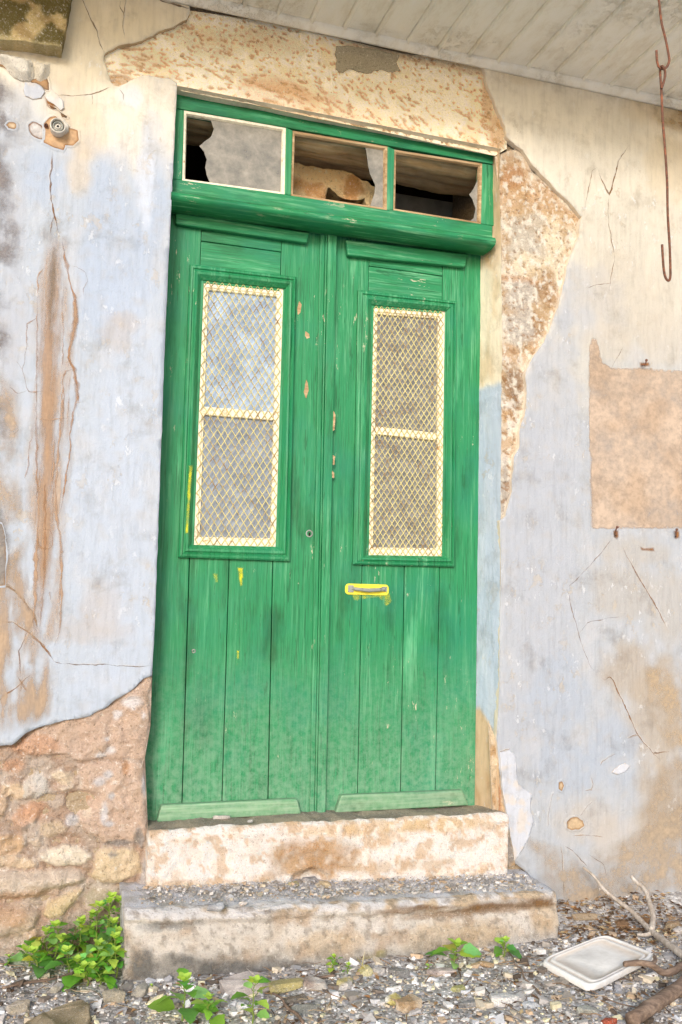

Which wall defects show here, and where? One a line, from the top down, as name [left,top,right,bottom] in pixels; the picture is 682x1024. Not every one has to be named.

spalling [0,64,82,153]
spalling [104,11,579,518]
crack [585,149,626,289]
peeling [589,339,682,529]
crack [0,583,141,700]
crack [569,543,664,757]
spalling [131,721,543,905]